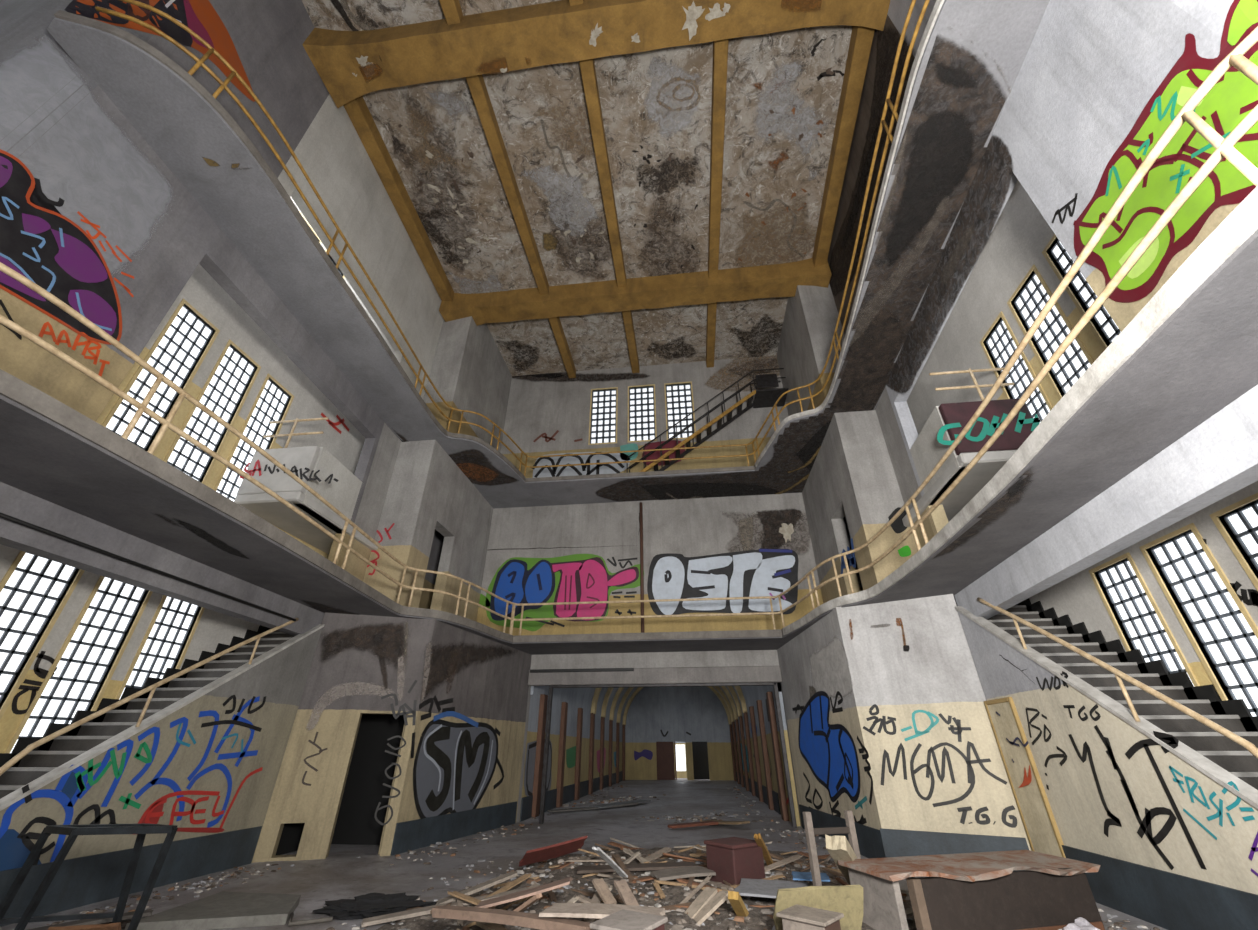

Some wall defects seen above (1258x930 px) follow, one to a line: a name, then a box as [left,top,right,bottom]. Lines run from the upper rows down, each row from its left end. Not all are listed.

peeling [589,23,603,47]
peeling [682,1,731,41]
damp [829,29,1013,410]
damp [497,341,648,382]
damp [647,337,696,359]
damp [707,314,783,391]